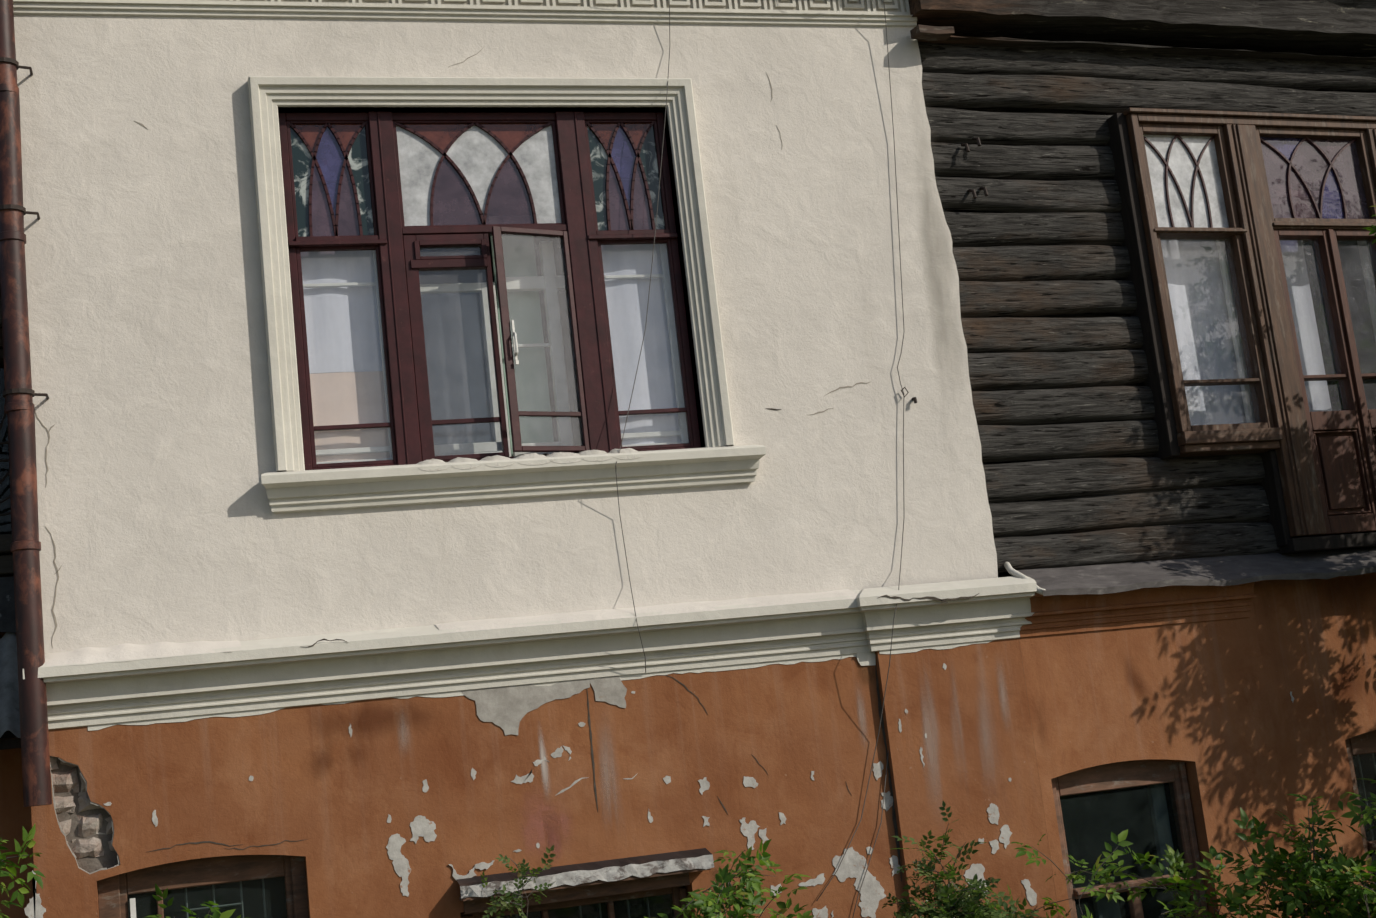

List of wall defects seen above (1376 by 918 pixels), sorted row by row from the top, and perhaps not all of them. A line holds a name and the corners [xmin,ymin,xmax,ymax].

crack [765,382,869,415]
flaking render [461,676,635,735]
flaking render [50,756,120,874]
crack [149,839,306,852]
peeling [386,814,437,897]
peeling [771,847,900,918]